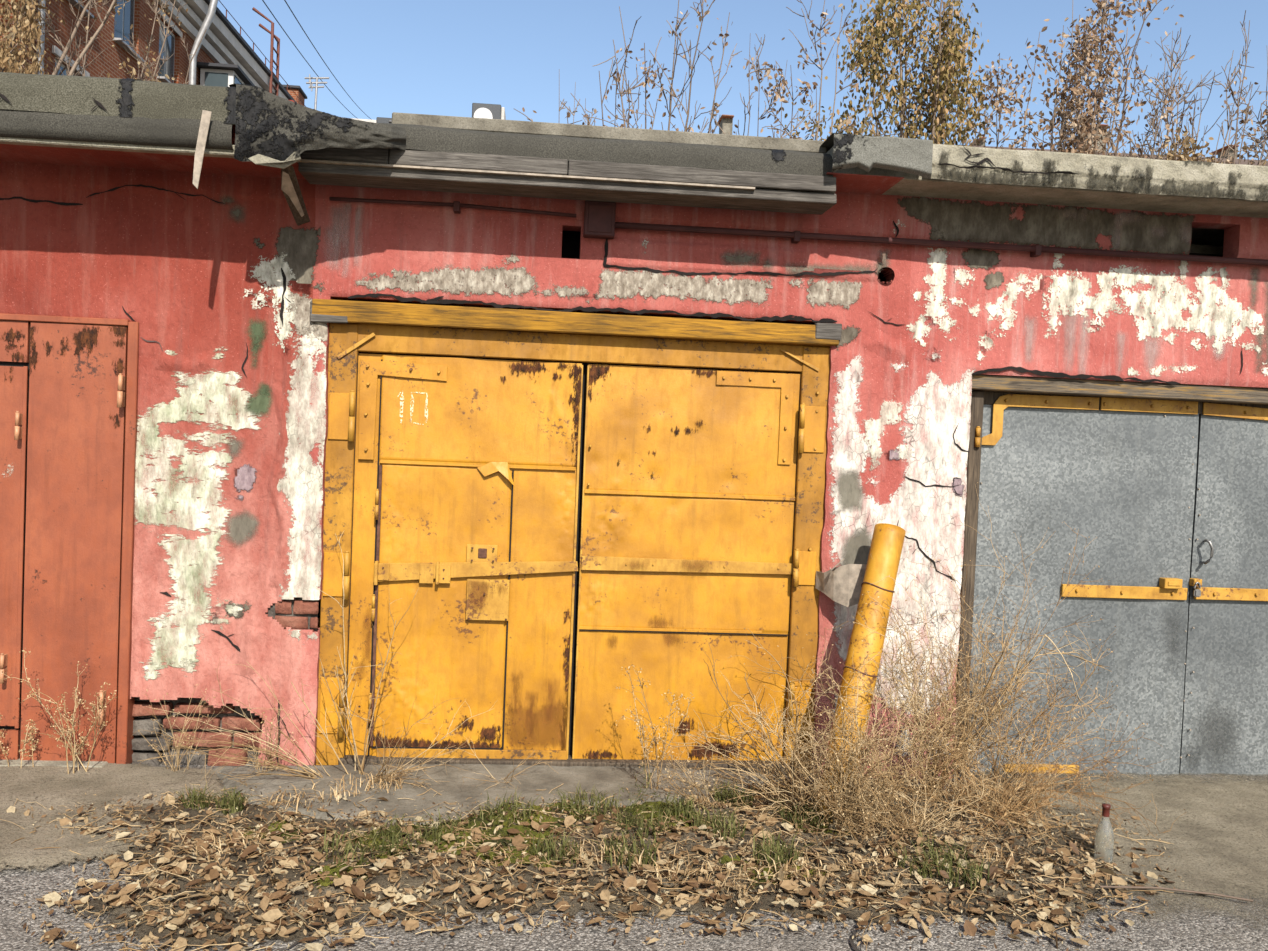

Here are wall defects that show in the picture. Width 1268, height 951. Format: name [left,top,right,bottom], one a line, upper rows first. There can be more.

crack [0,184,225,206]
crack [603,239,877,277]
crack [348,293,837,323]
corrosion [2,324,126,383]
peeling [243,227,328,640]
peeling [828,197,1268,759]
peeling [134,347,268,680]
spalling [131,697,264,766]